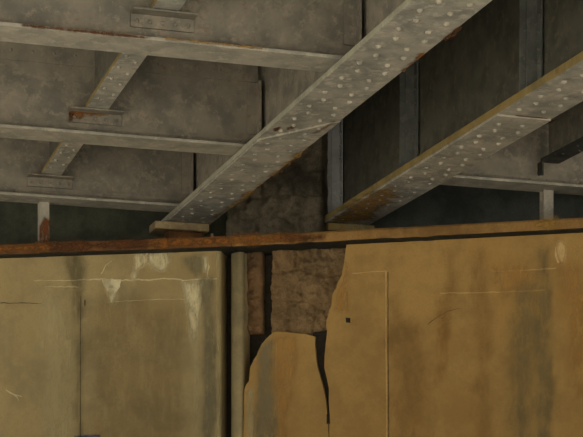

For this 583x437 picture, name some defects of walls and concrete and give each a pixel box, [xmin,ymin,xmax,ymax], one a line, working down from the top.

rust [0,218,322,252]
spalling [246,248,346,336]